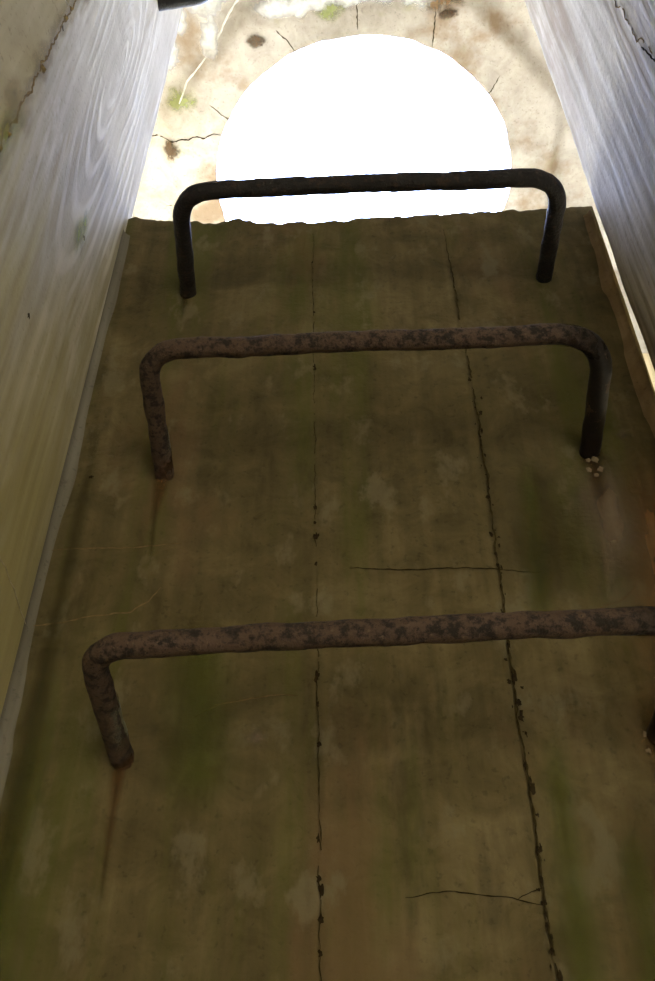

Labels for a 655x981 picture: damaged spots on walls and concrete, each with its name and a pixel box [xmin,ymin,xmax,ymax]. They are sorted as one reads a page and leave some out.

crack [152,106,232,143]
crack [355,230,535,613]
crack [405,640,563,981]